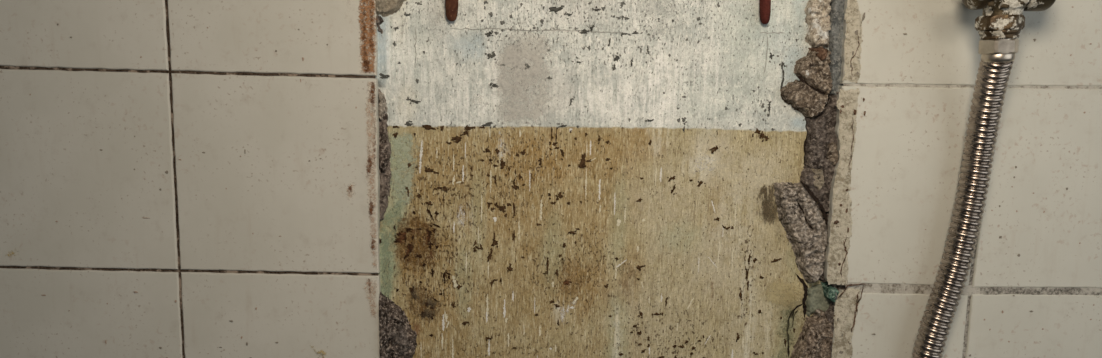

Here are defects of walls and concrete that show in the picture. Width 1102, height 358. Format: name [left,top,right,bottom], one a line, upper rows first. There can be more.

spalling [376,0,422,46]
spalling [481,1,523,66]
spalling [530,5,572,31]
spalling [578,2,659,70]
spalling [470,148,526,190]
spalling [538,123,609,168]
damp [380,133,423,271]
spalling [378,73,498,358]
spalling [487,202,515,242]
spalling [542,228,580,285]
spalling [739,254,764,301]
spalling [630,297,668,353]